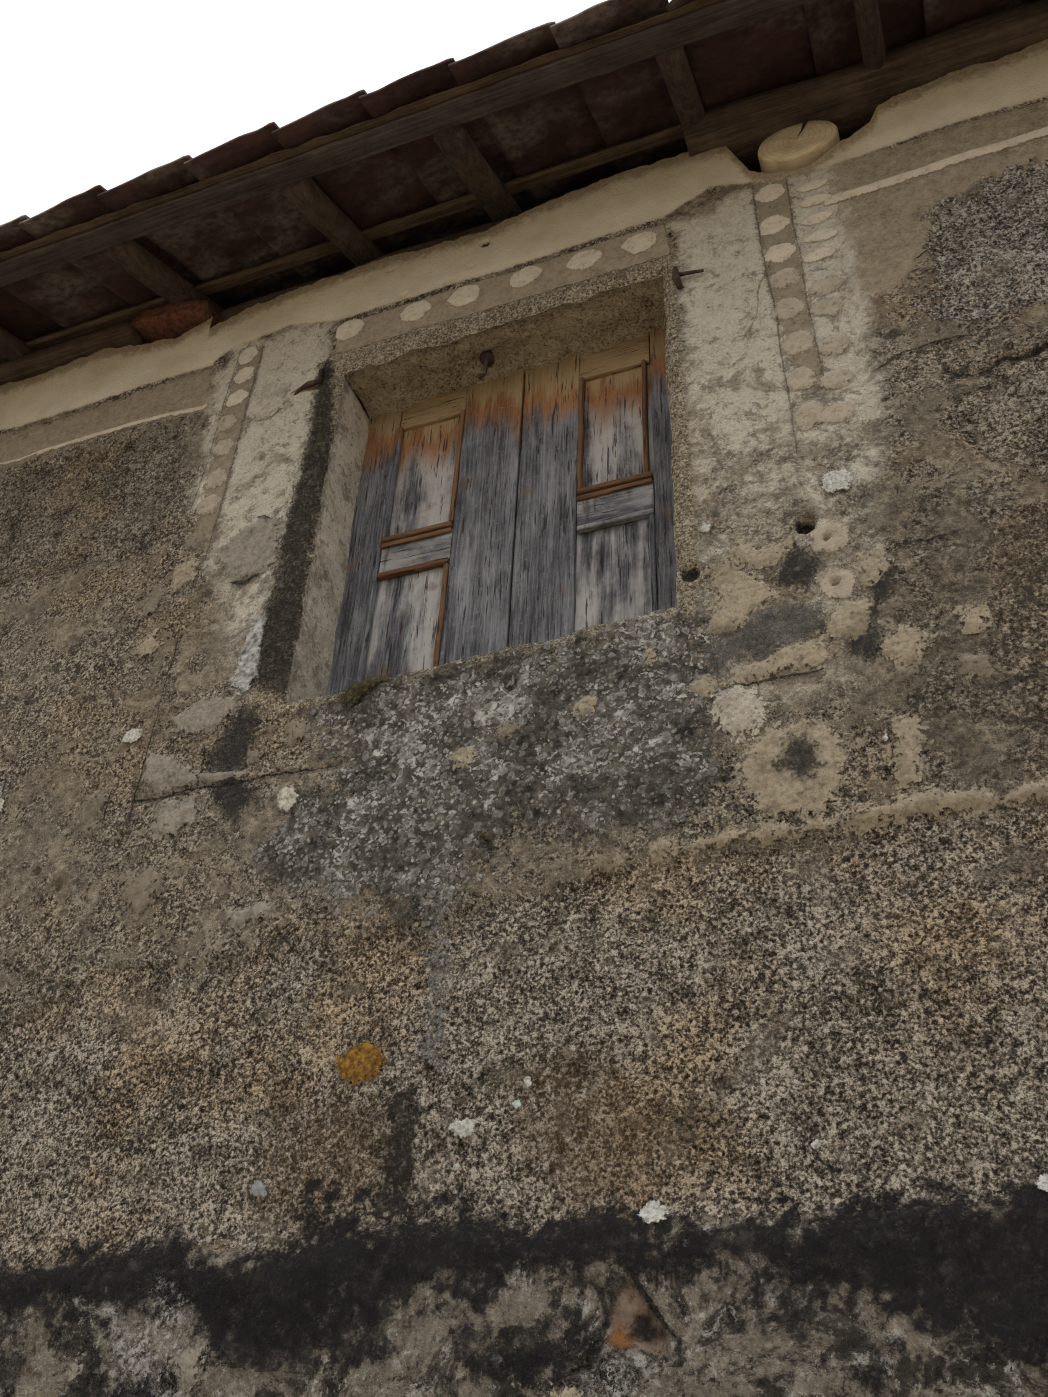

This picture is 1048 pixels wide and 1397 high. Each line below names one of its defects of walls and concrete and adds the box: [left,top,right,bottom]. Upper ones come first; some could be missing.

crack [874,335,1048,377]
flaking render [247,381,291,426]
flaking render [127,516,283,659]
water stain [201,356,339,828]
flaking render [687,528,1009,702]
flaking render [643,643,658,667]
flaking render [167,695,243,737]
flaking render [572,695,597,718]
flaking render [0,708,1048,1279]
water stain [0,1081,1048,1397]
spalling [609,1283,669,1358]